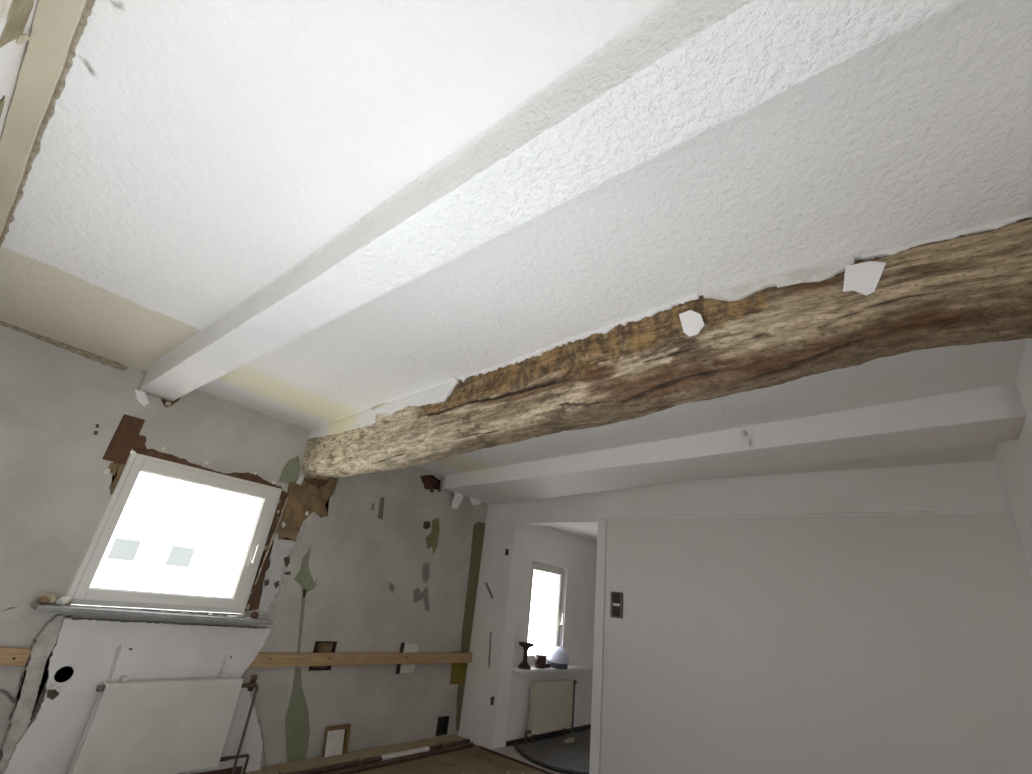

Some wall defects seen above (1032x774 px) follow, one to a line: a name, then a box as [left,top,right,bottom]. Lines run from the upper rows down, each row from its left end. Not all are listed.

spalling [308,211,1032,439]
peeling [103,462,127,495]
peeling [132,443,338,611]
spalling [420,475,482,509]